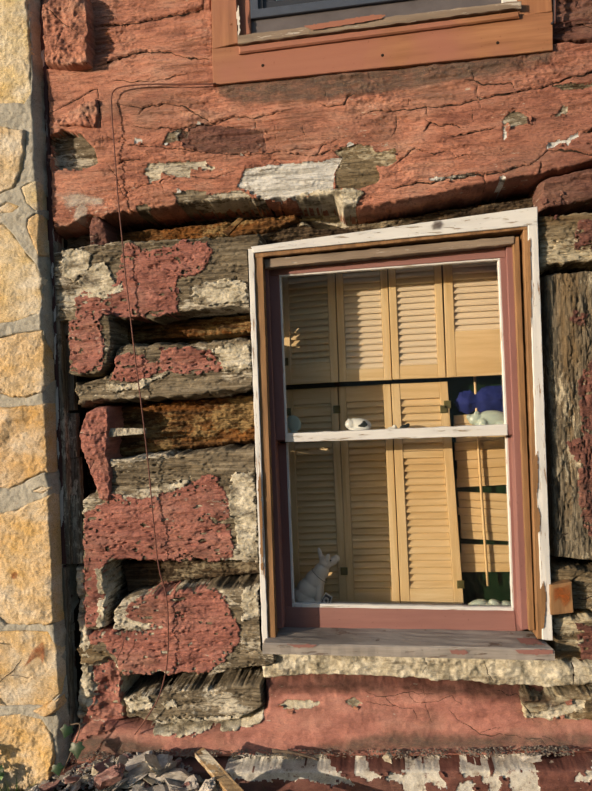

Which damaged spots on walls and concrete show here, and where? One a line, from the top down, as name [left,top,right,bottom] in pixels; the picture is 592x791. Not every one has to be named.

peeling [144,121,266,183]
peeling [174,141,398,223]
crack [368,71,592,162]
crack [394,131,592,192]
peeling [544,132,579,149]
peeling [68,239,223,383]
peeling [566,360,592,539]
peeling [76,474,240,743]
peeling [277,699,320,714]
crack [365,659,554,749]
peeling [225,751,540,791]
peeling [574,760,592,786]